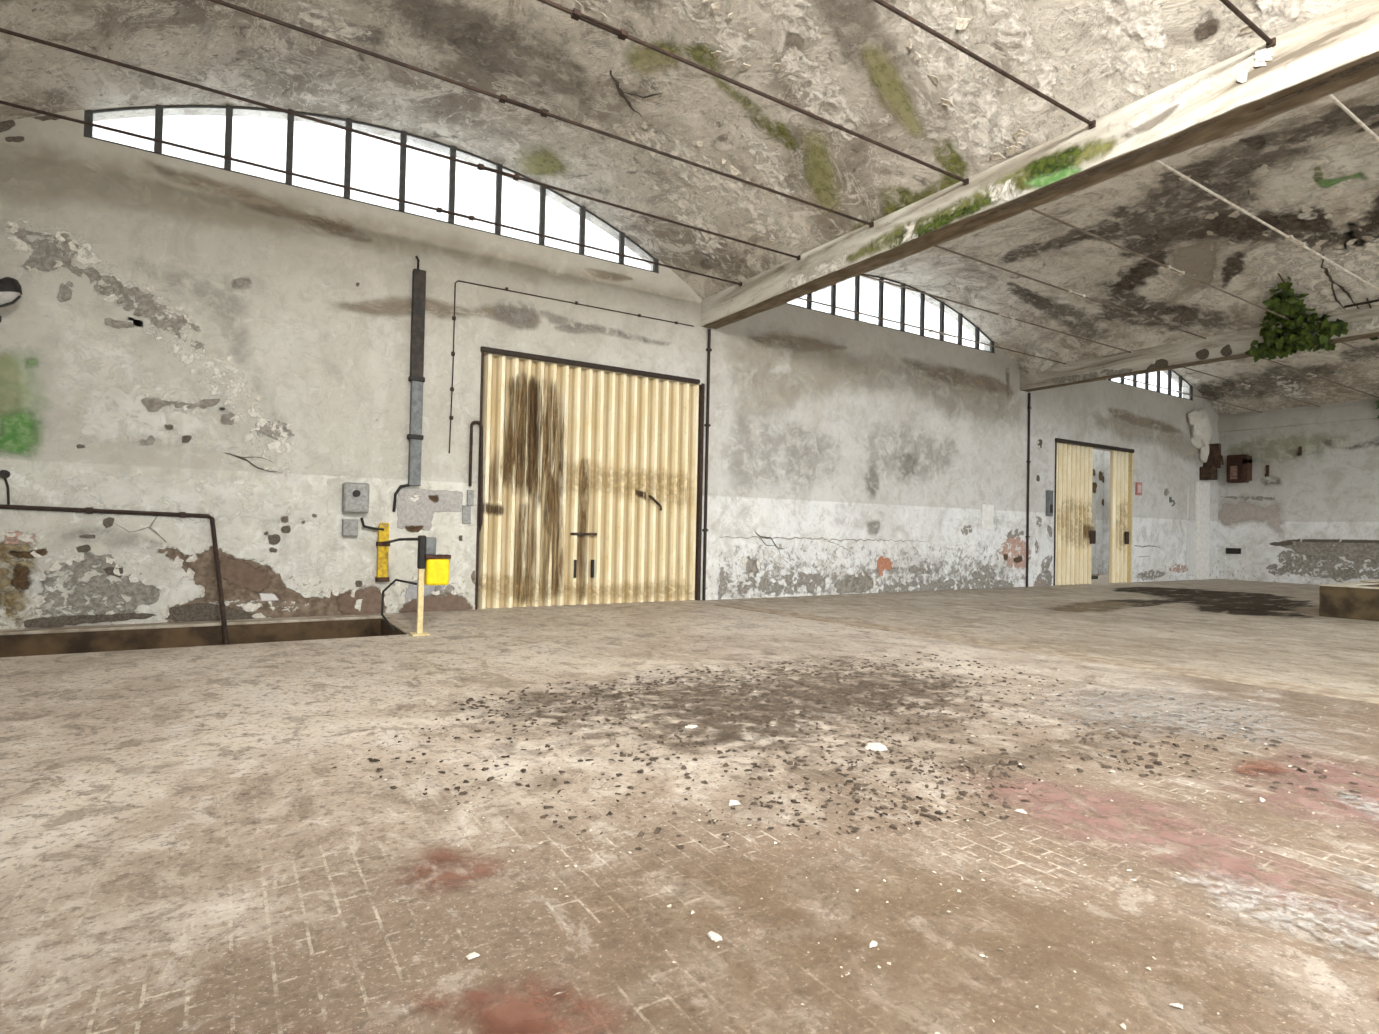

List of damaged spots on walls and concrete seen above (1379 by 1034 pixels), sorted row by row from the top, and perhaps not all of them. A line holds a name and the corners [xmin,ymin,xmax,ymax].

damp [822,0,902,68]
damp [1195,19,1218,40]
damp [702,51,1379,337]
peeling [5,220,294,479]
spalling [0,514,475,658]
peeling [718,517,1053,600]
flaking render [1266,537,1379,583]